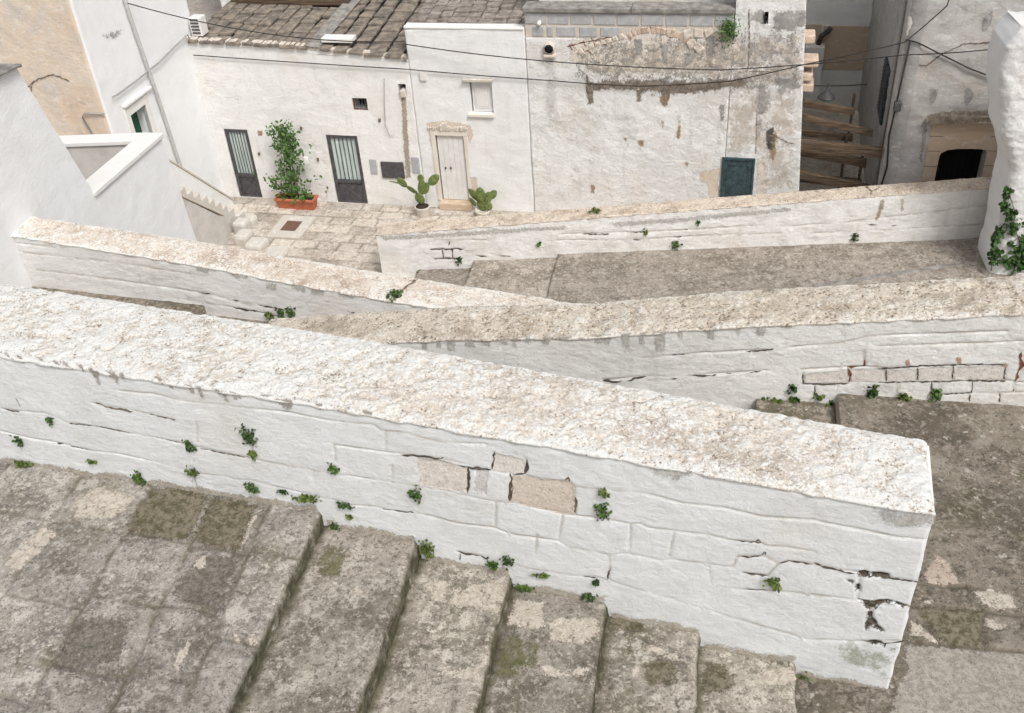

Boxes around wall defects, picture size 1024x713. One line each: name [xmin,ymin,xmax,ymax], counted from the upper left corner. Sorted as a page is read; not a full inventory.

peeling [569,26,746,75]
crack [28,74,70,92]
peeling [805,357,1008,383]
crack [402,452,529,501]
peeling [493,453,576,514]
crack [738,539,923,590]